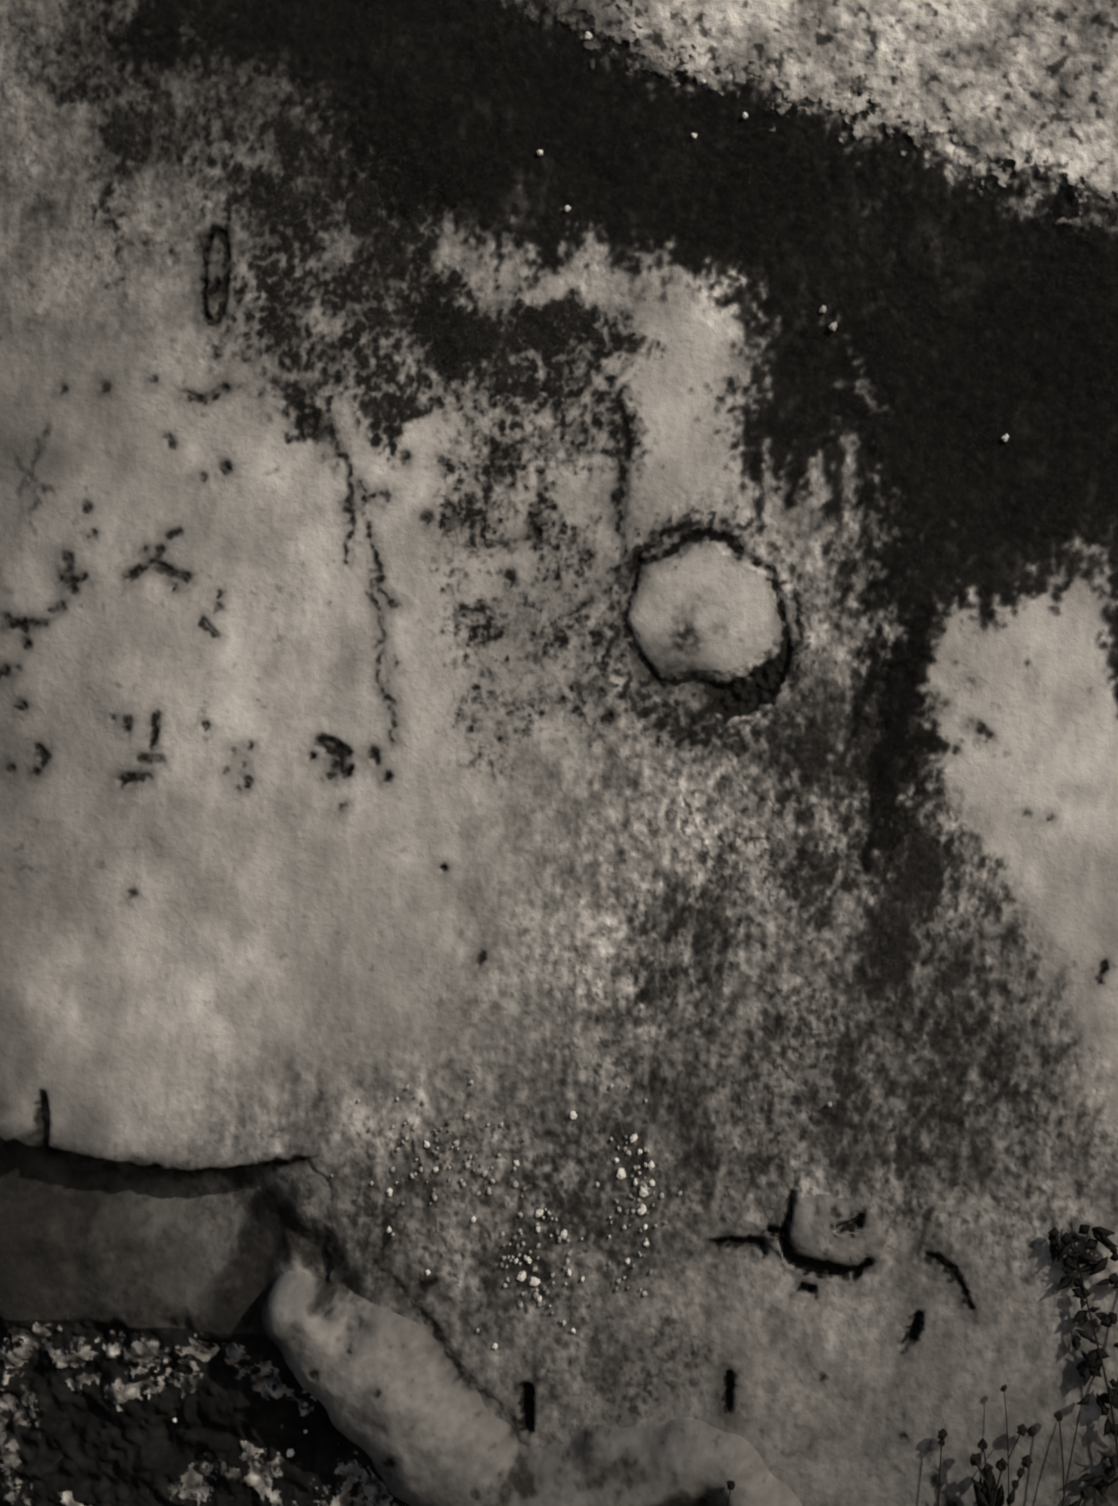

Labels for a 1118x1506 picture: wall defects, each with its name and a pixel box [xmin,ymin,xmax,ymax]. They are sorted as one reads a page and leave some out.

crack [332,424,398,742]
damp [36,0,1118,1239]
crack [48,1146,319,1174]
damp [0,1118,495,1344]
damp [478,1072,756,1321]
damp [570,1318,710,1423]
crack [925,1251,975,1310]